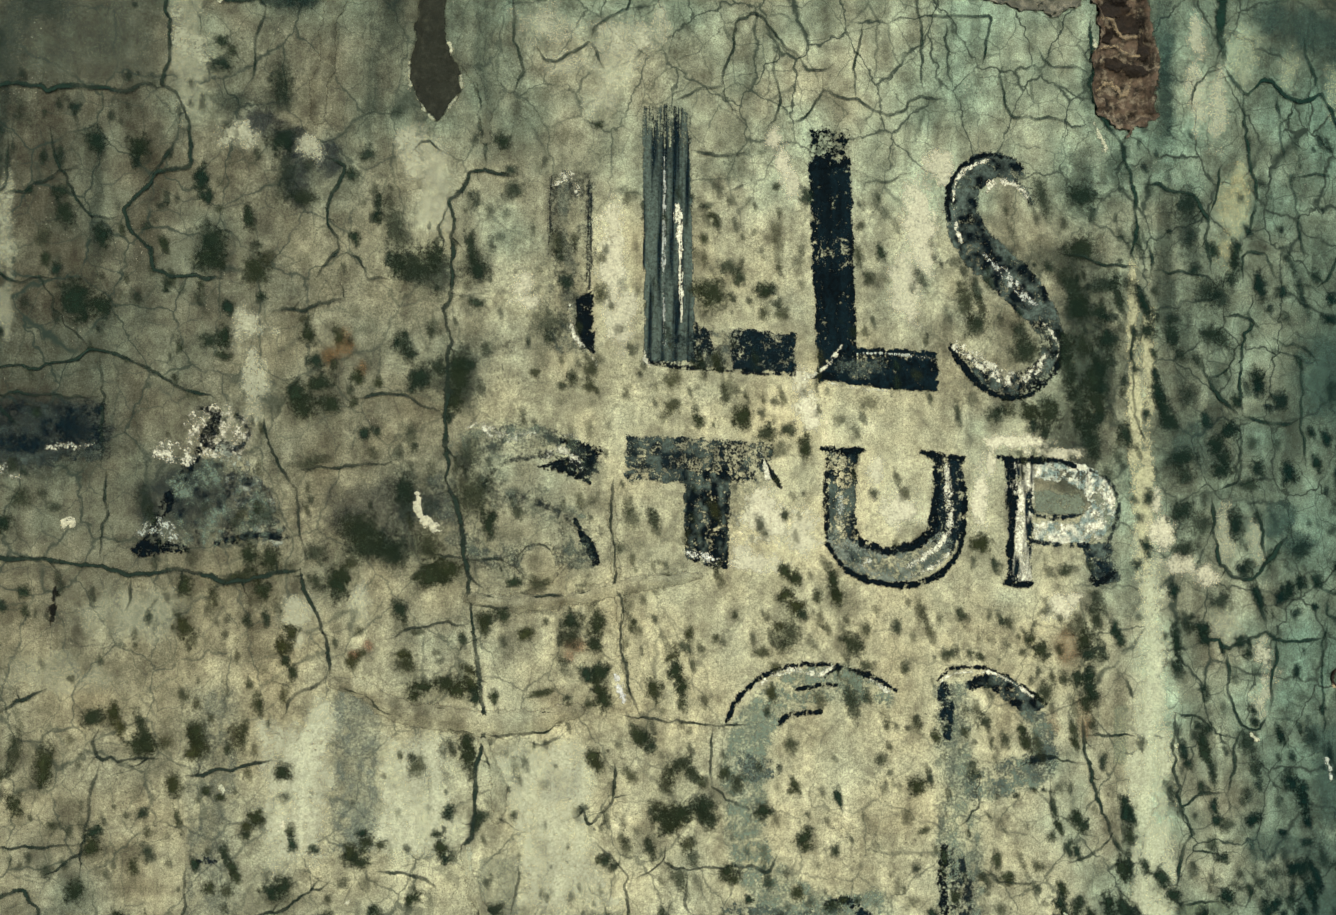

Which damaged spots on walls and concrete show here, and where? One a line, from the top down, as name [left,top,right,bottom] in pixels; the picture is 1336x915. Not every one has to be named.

crack [0,0,217,281]
spalling [407,0,464,120]
spalling [990,0,1160,152]
crack [0,272,389,715]
damp [458,606,612,713]
crack [364,72,740,849]
damp [691,353,822,457]
damp [714,488,874,718]
crack [683,0,1336,905]
damp [967,181,1336,915]
crack [0,737,151,915]
damp [595,753,742,888]